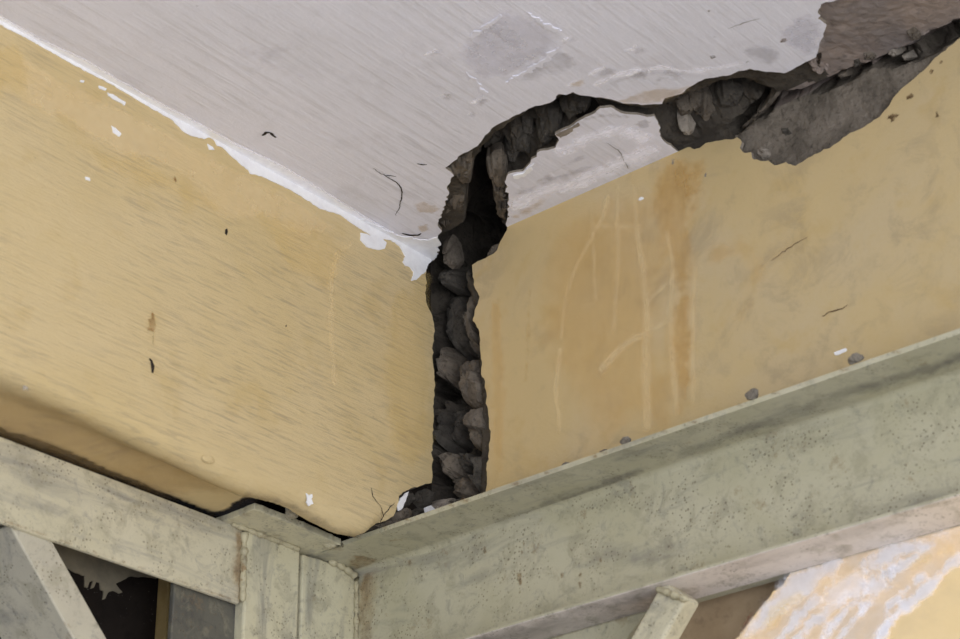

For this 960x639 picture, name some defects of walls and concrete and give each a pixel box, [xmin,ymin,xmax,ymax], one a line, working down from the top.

peeling [0,16,441,281]
crack [375,27,924,501]
flaking render [735,0,960,166]